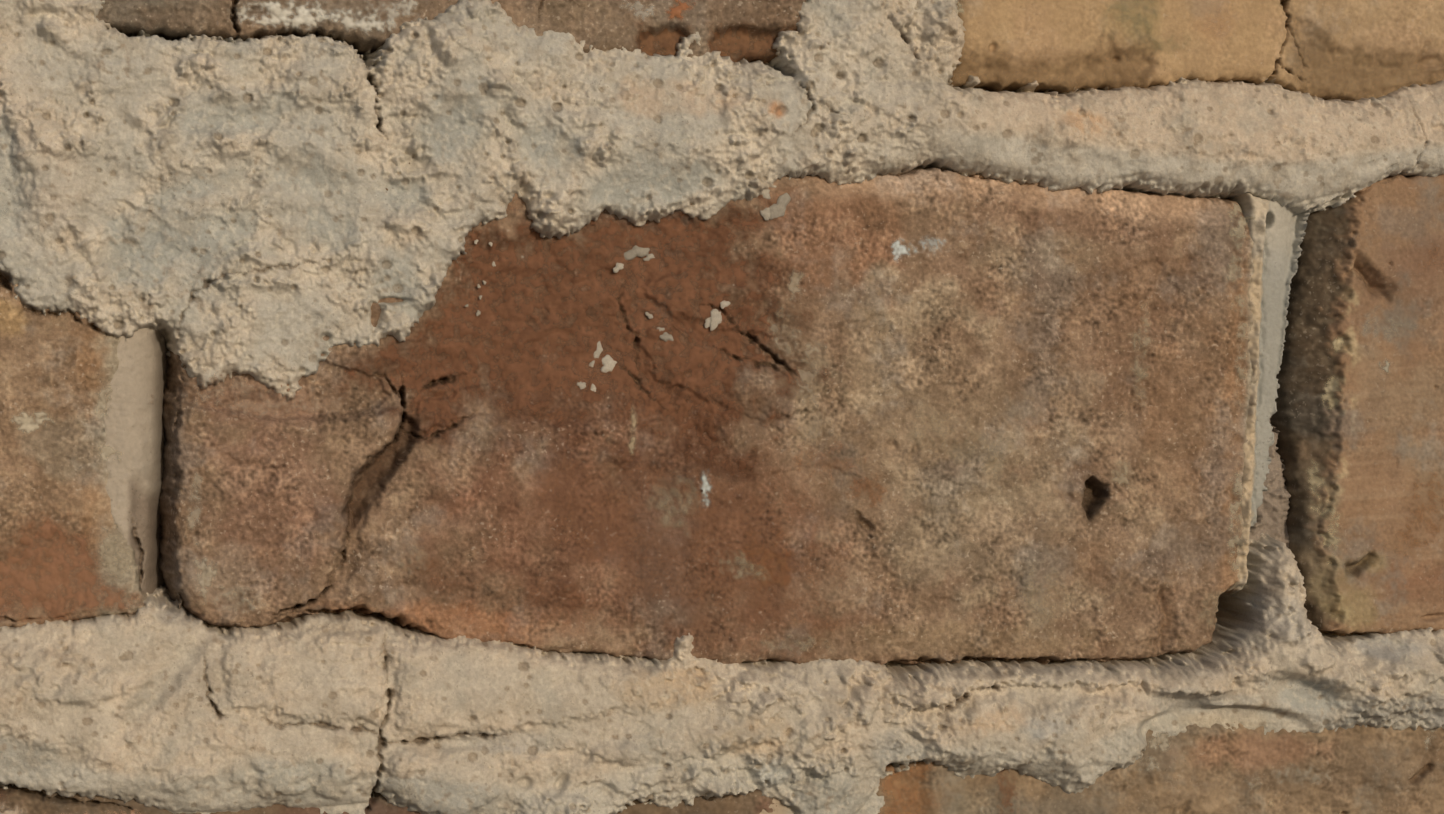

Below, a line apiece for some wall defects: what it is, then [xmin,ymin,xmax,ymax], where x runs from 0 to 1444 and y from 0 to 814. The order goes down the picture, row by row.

crack [230,0,239,36]
crack [620,306,648,393]
crack [714,307,792,372]
crack [377,374,456,442]
crack [279,550,345,612]